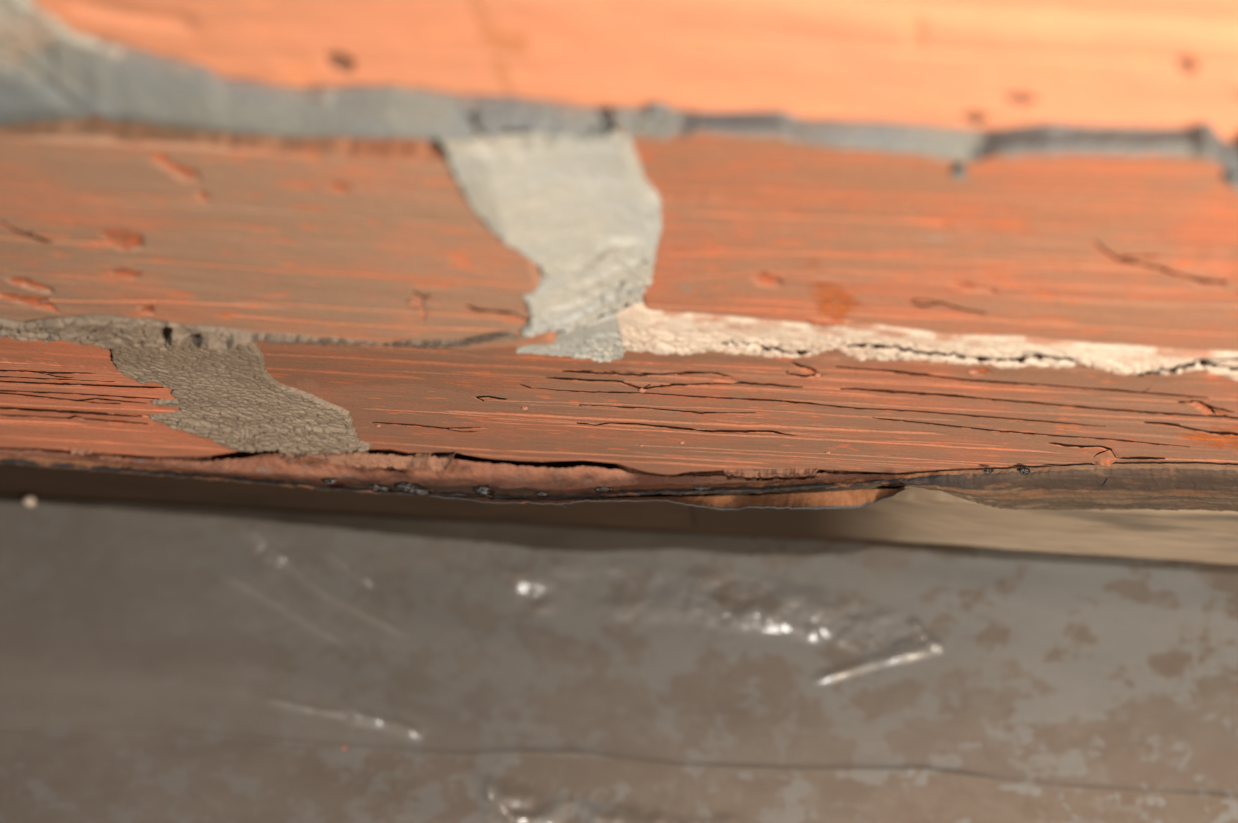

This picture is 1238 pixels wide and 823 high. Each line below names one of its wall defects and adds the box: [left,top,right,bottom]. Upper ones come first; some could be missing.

spalling [325,52,356,73]
spalling [3,277,58,312]